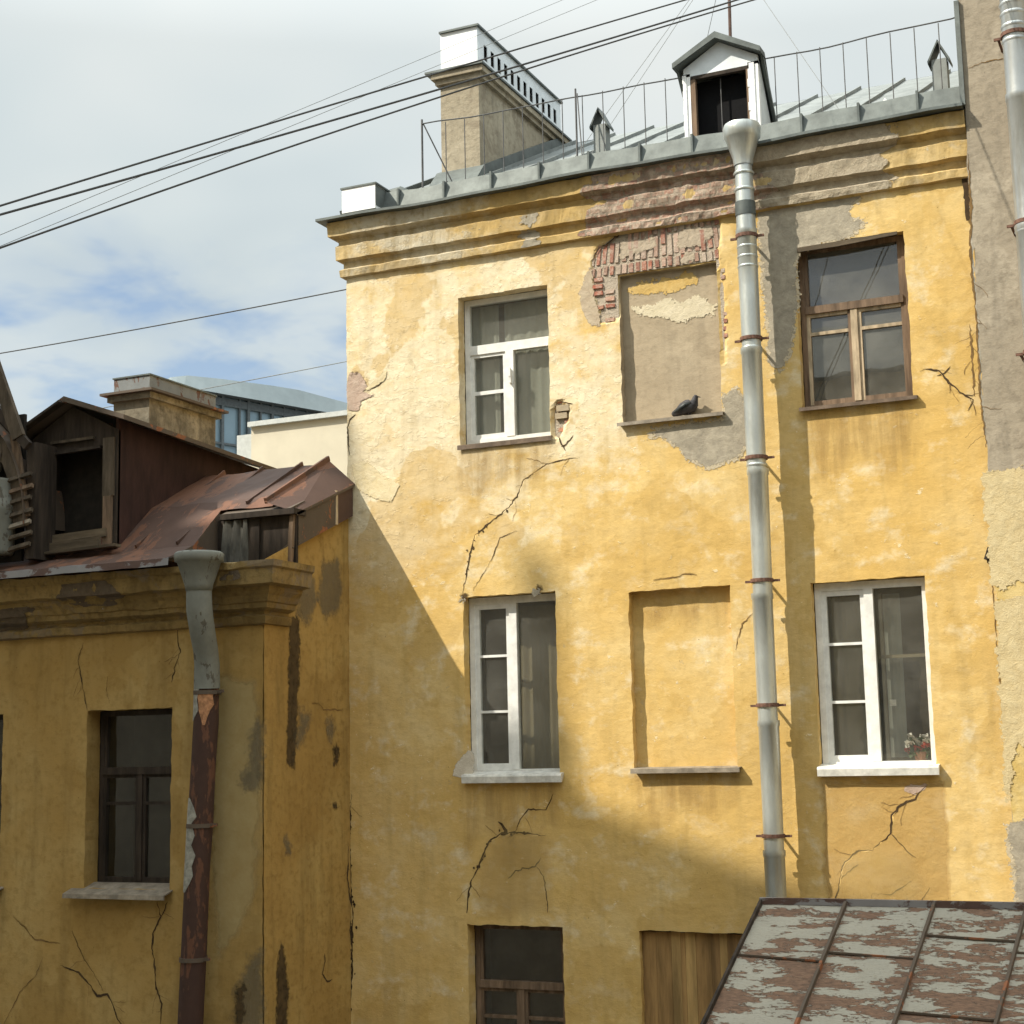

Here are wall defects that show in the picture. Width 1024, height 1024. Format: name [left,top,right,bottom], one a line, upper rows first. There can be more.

spalling [578,152,736,351]
spalling [752,123,900,373]
crack [920,153,996,448]
flaking render [647,386,746,471]
crack [462,458,580,599]
rust [197,694,214,725]
water stain [286,560,341,768]
peeling [980,464,1024,803]
crack [457,795,553,914]
crack [835,786,930,899]
flaking render [1003,818,1024,902]
water stain [275,944,290,1024]